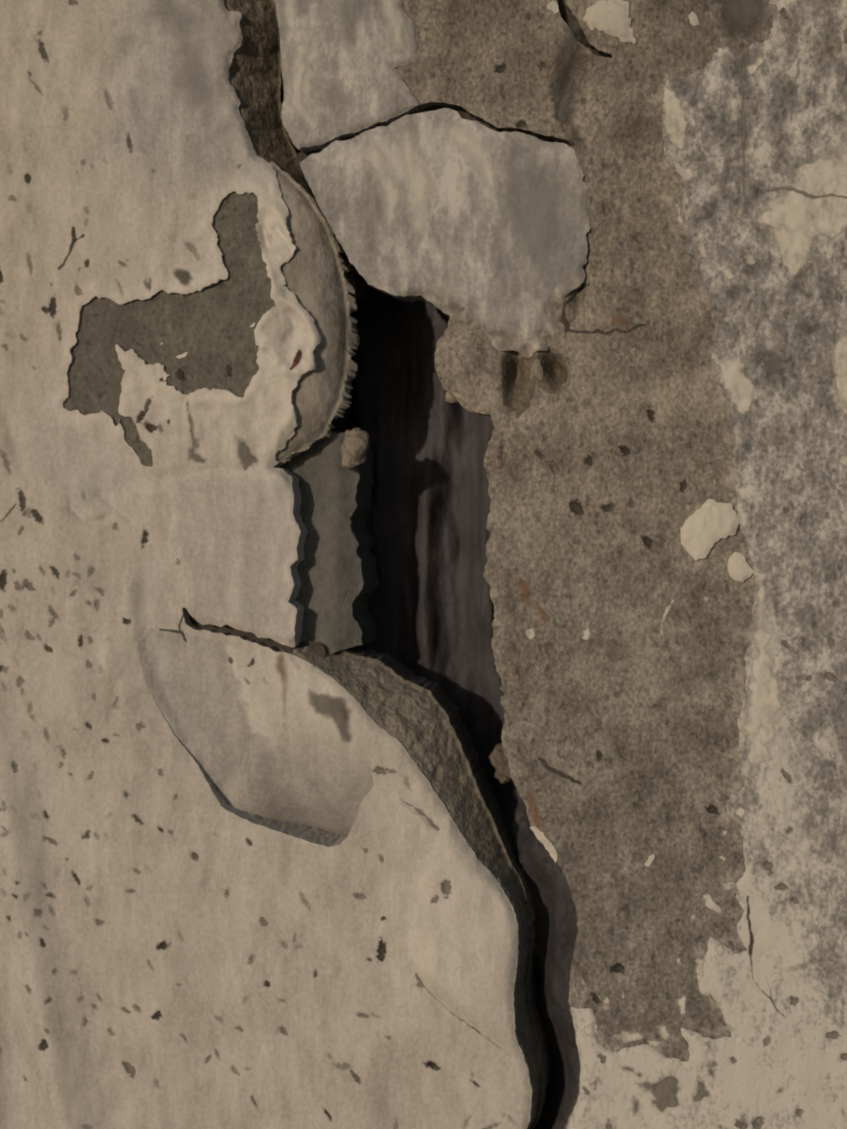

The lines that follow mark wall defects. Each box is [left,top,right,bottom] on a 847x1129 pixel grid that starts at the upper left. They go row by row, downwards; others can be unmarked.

crack [224,0,353,208]
crack [412,0,611,146]
flaking render [756,148,847,280]
spalling [42,283,62,340]
peeling [63,161,379,655]
flaking render [833,336,847,414]
spalling [0,569,35,592]
spalling [18,490,43,534]
peeling [302,0,811,1129]
spalling [138,628,396,835]
crack [159,251,581,1129]
spalling [122,1005,162,1020]